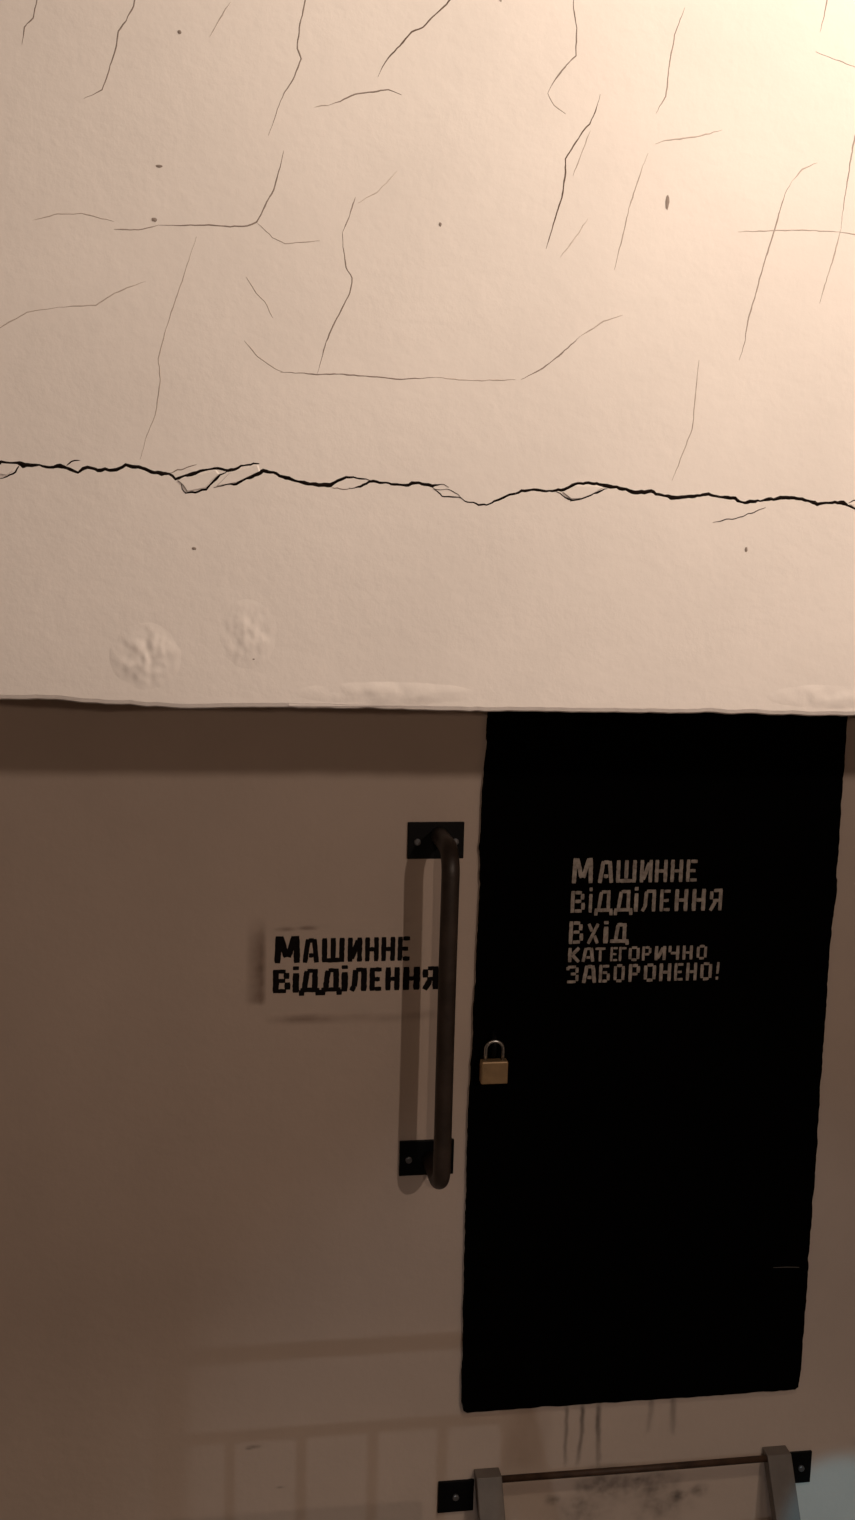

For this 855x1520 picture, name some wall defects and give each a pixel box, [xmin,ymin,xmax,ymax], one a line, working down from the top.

crack [0,0,855,522]